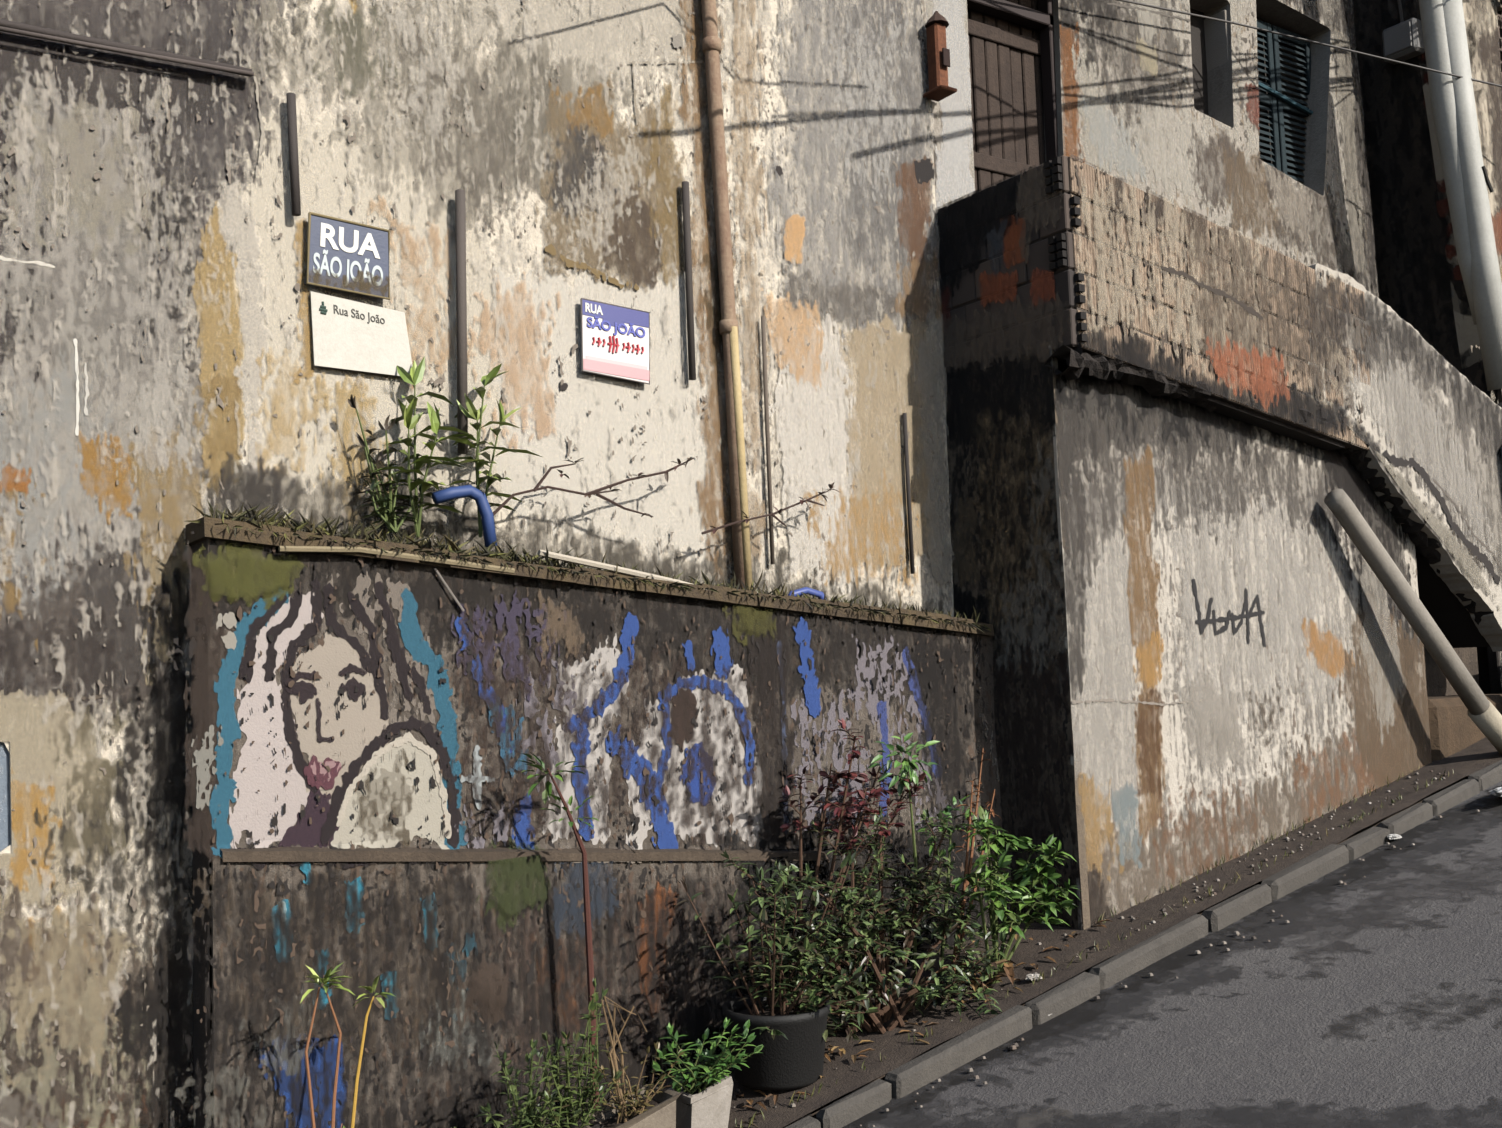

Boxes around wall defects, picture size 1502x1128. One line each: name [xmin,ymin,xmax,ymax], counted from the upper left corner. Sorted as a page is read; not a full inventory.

damp [0,0,734,587]
damp [0,588,165,1011]
damp [72,492,175,807]
damp [163,0,1308,1128]
damp [1297,446,1374,612]
damp [1250,592,1427,827]
damp [38,950,193,1128]